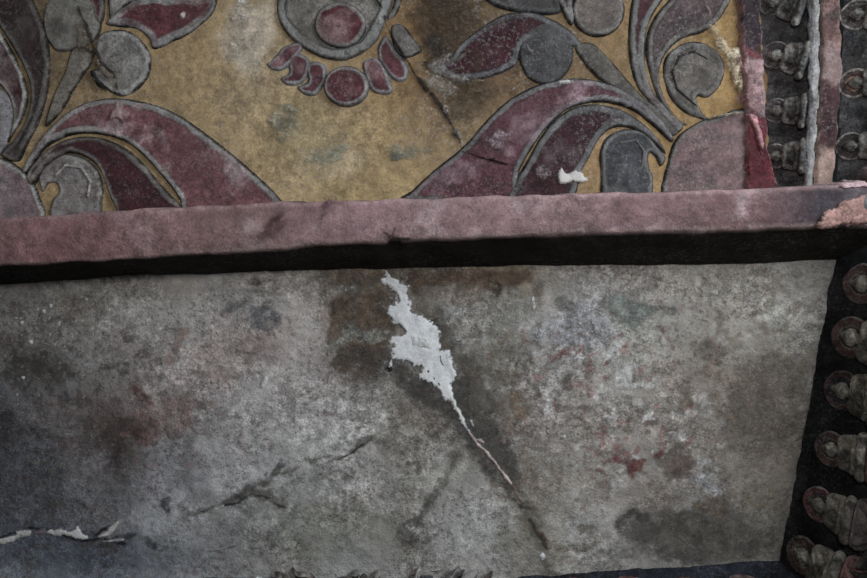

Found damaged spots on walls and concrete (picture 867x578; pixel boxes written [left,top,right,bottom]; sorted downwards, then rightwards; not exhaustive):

crack [377,0,509,165]
peeling [485,129,514,149]
peeling [535,165,587,184]
peeling [817,167,867,229]
peeling [381,271,469,431]
damp [319,272,555,576]
crack [188,425,397,516]
crack [469,420,548,560]
peeling [0,526,88,544]
crack [0,525,157,551]
peeling [99,513,139,542]